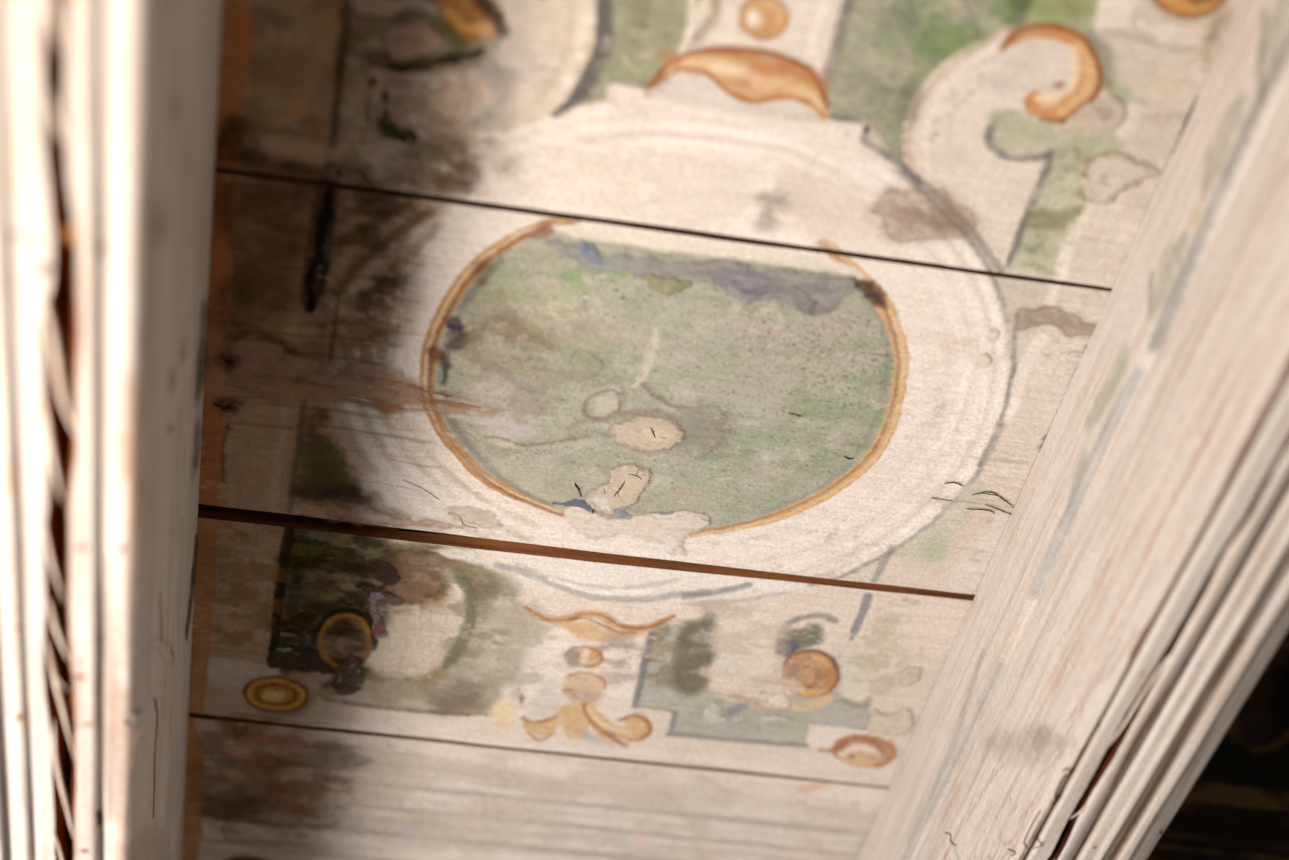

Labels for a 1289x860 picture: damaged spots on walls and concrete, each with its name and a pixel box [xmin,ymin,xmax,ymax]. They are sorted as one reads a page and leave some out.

damp [306,186,335,311]
damp [443,320,464,383]
peeling [552,416,711,557]
damp [186,534,198,640]
crack [1007,436,1289,860]